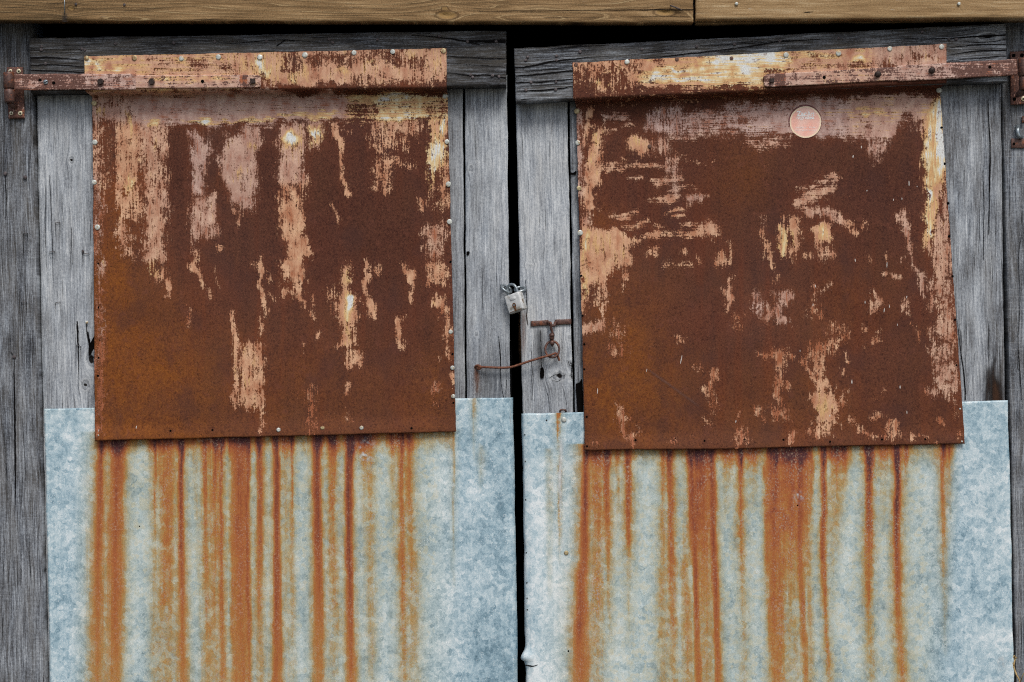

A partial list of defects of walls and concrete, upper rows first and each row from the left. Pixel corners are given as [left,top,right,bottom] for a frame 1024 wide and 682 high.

rust [84,48,456,682]
rust [569,44,965,682]